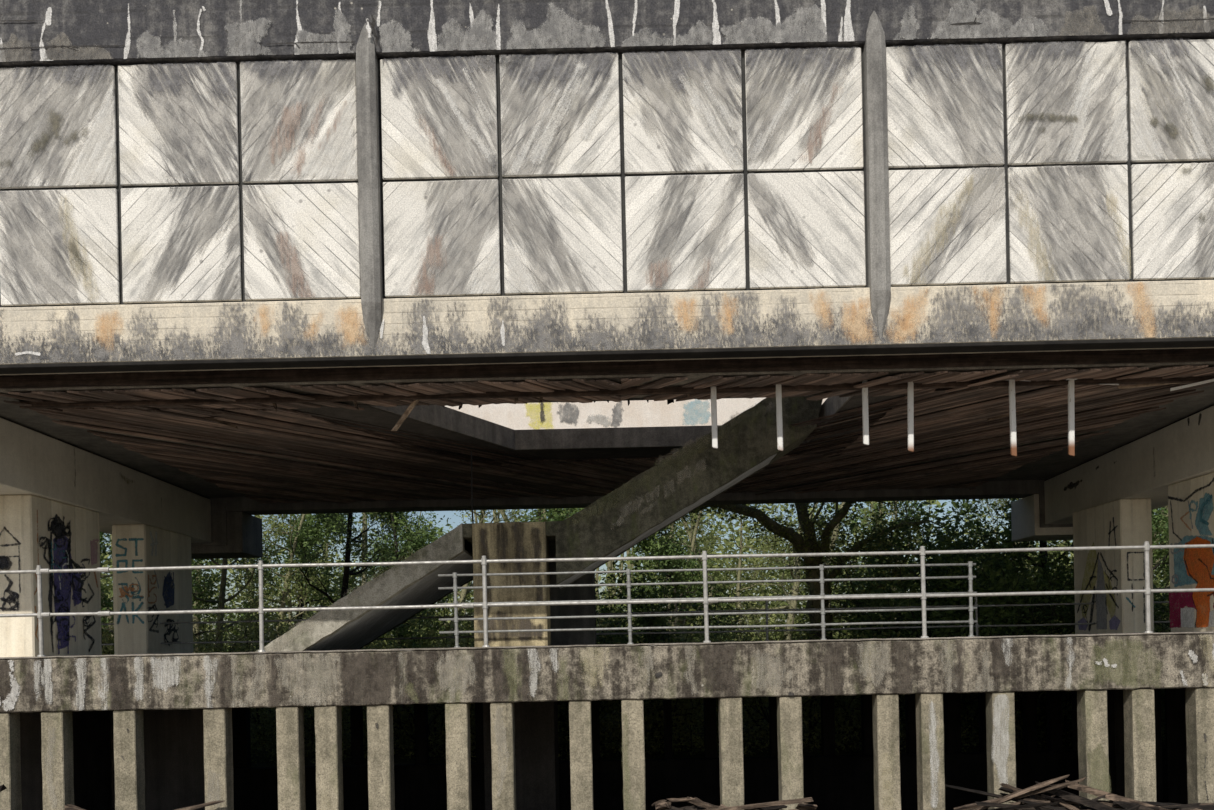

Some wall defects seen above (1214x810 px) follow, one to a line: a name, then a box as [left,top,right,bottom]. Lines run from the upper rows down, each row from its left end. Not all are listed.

damp [0,0,1214,364]
corrosion [815,294,872,342]
corrosion [1134,282,1154,338]
damp [474,522,558,702]
damp [0,659,52,712]
damp [75,657,179,710]
damp [203,655,233,708]
damp [266,654,281,707]
damp [340,651,437,705]
damp [822,642,843,695]
damp [954,640,969,692]